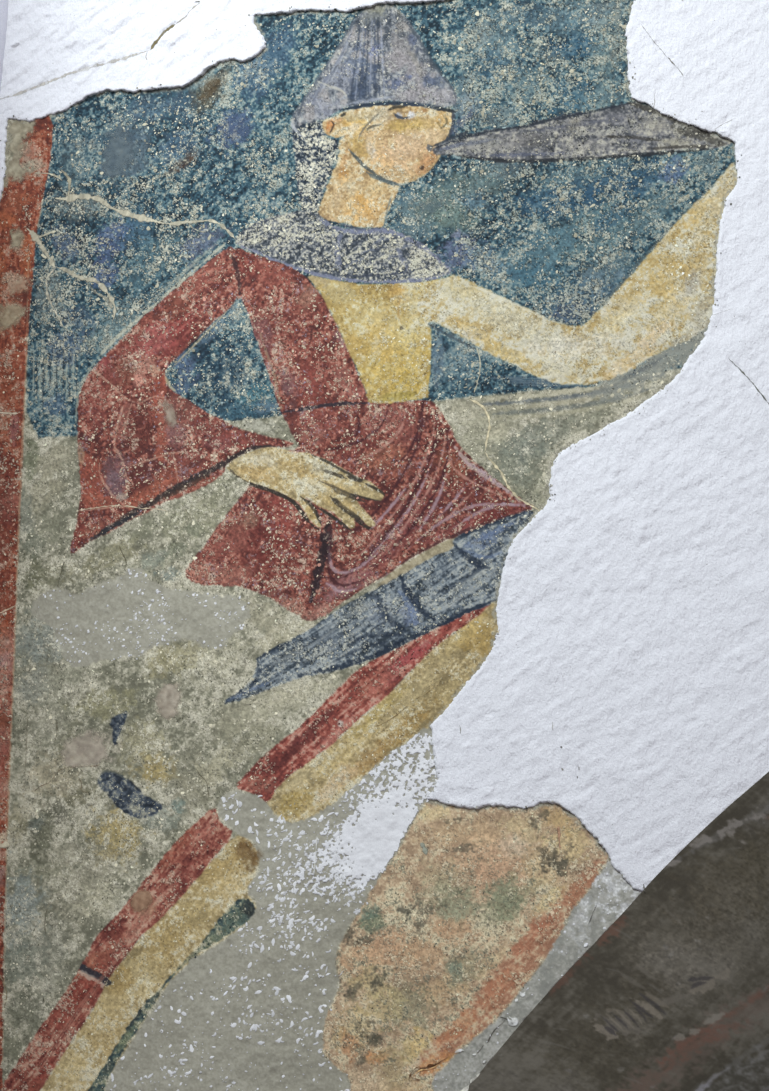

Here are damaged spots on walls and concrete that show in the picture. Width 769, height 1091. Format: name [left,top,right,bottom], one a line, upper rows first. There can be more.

crack [1,1,201,99]
crack [35,170,235,239]
crack [26,228,116,326]
peeling [288,733,437,904]